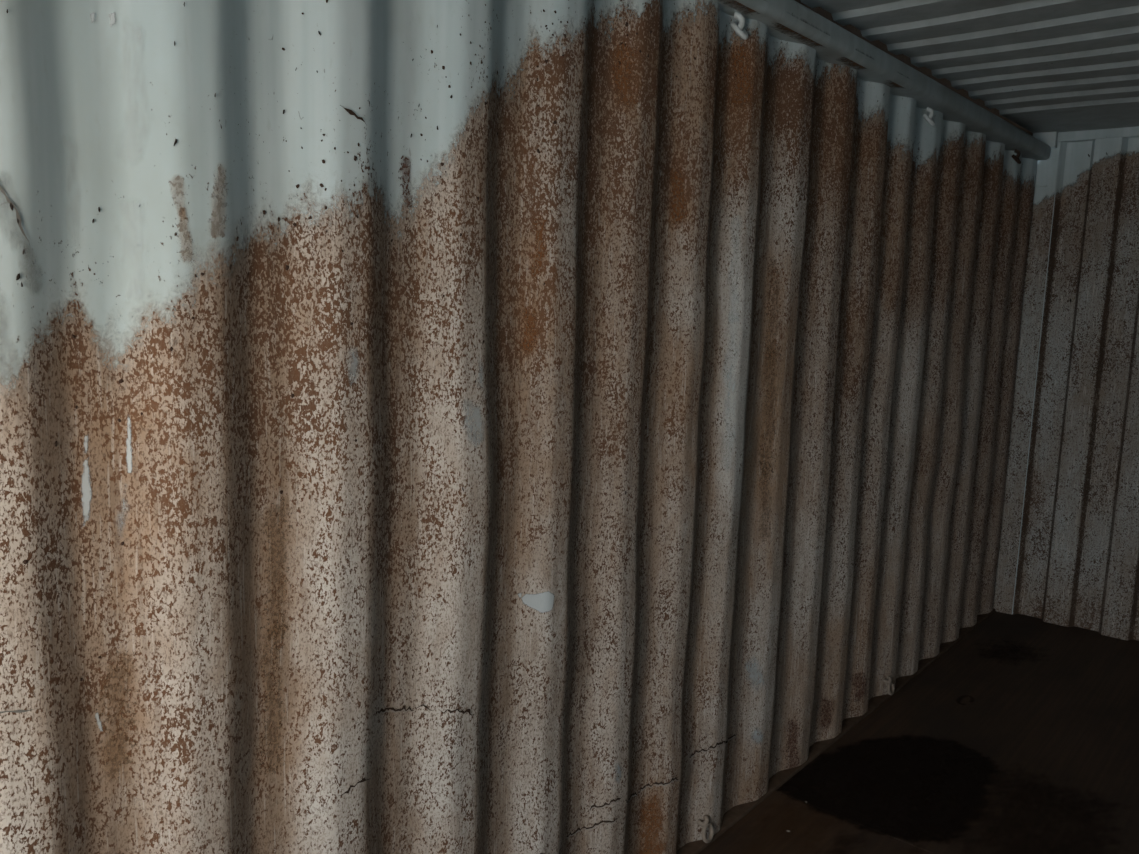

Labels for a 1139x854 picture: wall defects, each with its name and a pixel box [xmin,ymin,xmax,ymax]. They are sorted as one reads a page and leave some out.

rust [777,23,822,46]
rust [896,132,1139,678]
crack [376,704,475,715]
crack [540,731,736,854]
leakage [778,735,998,842]